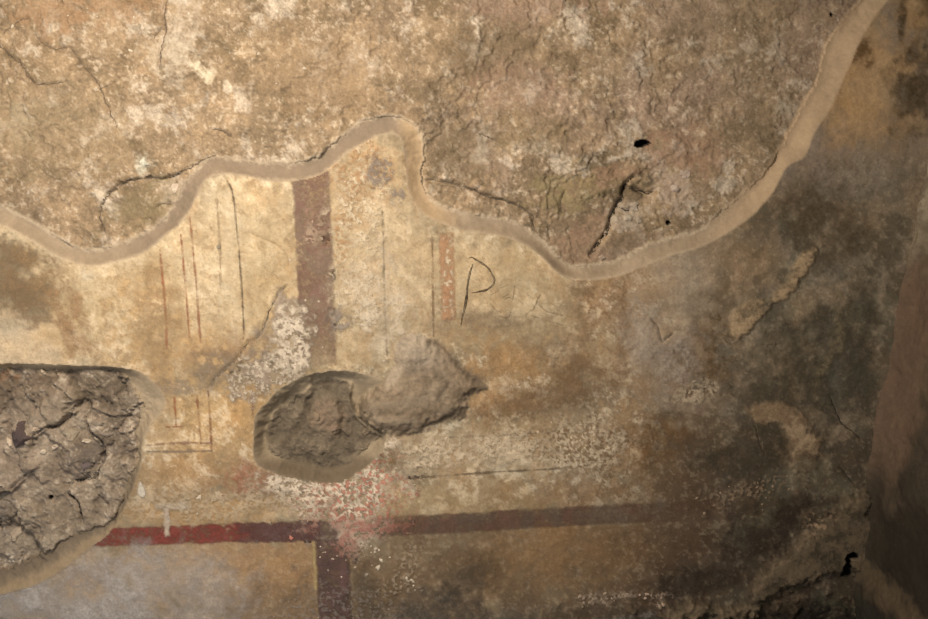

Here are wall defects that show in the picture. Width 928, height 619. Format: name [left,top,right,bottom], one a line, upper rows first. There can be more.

crack [0,18,117,128]
crack [590,178,653,255]
spalling [0,363,166,596]
spalling [139,292,627,577]